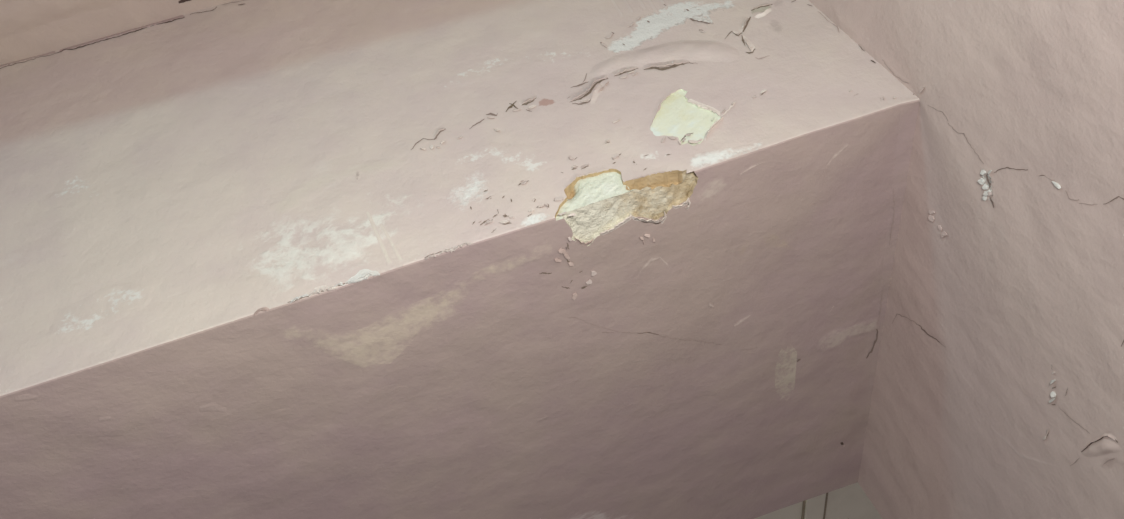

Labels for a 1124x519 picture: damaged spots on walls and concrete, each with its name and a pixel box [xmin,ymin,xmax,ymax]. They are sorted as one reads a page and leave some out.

crack [0,0,244,69]
crack [726,0,1124,208]
spalling [470,86,735,300]
crack [866,293,945,358]
crack [1063,411,1122,465]